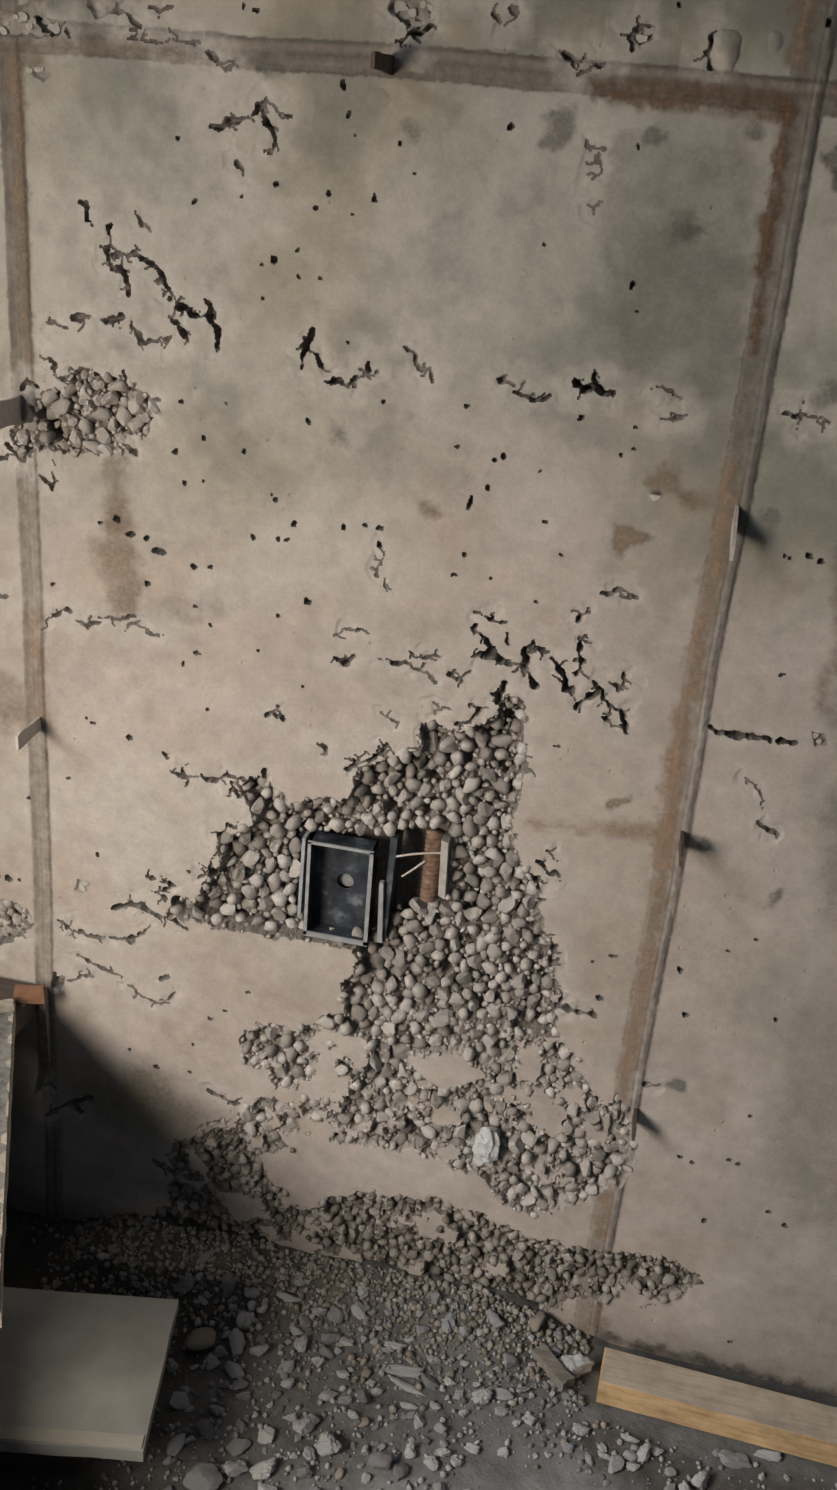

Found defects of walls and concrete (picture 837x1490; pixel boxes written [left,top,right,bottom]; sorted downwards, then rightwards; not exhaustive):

crack [209,96,293,177]
rust [594,81,794,353]
flaking render [13,370,160,458]
crack [0,199,222,492]
crack [296,326,434,389]
crack [496,369,688,423]
crack [316,586,639,777]
crack [708,724,798,746]
flaking render [0,899,34,936]
crack [0,751,273,1008]
flaking render [151,694,702,1311]
crack [530,847,598,1019]